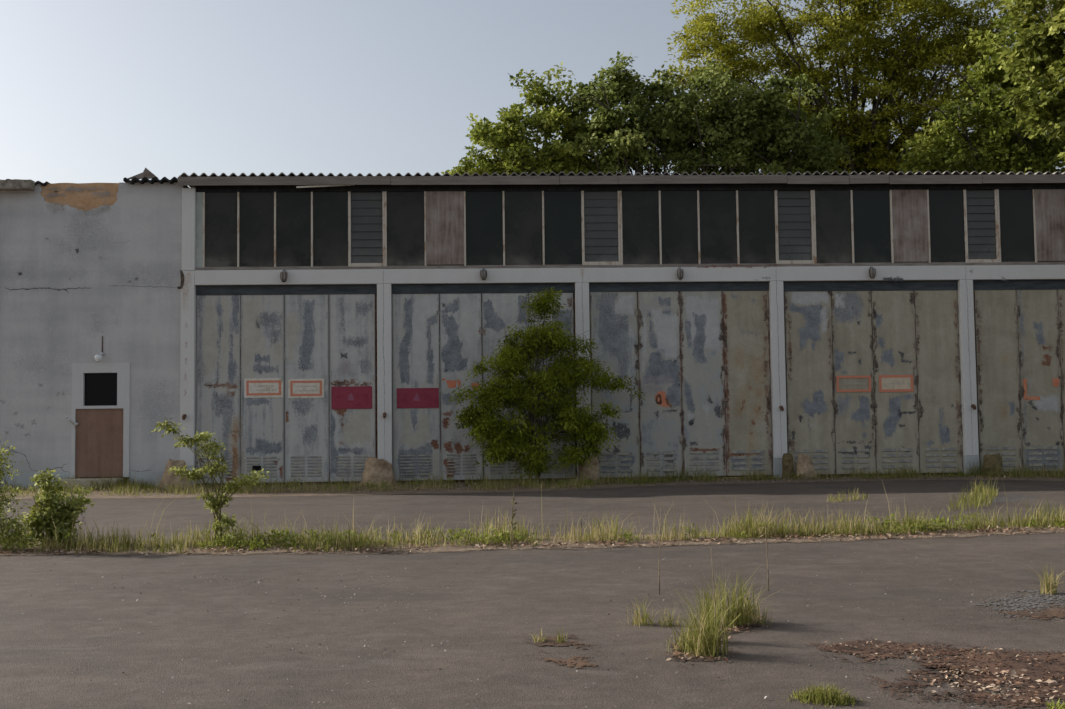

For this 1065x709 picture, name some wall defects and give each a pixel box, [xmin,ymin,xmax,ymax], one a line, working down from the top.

spalling [40,183,119,217]
crack [6,286,89,294]
peeling [197,295,285,477]
peeling [298,298,316,372]
peeling [288,398,374,475]
peeling [337,297,374,374]
peeling [396,294,468,384]
rust [430,411,471,483]
peeling [593,291,727,475]
rust [689,293,773,474]
peeling [784,291,924,457]
peeling [1007,376,1065,463]